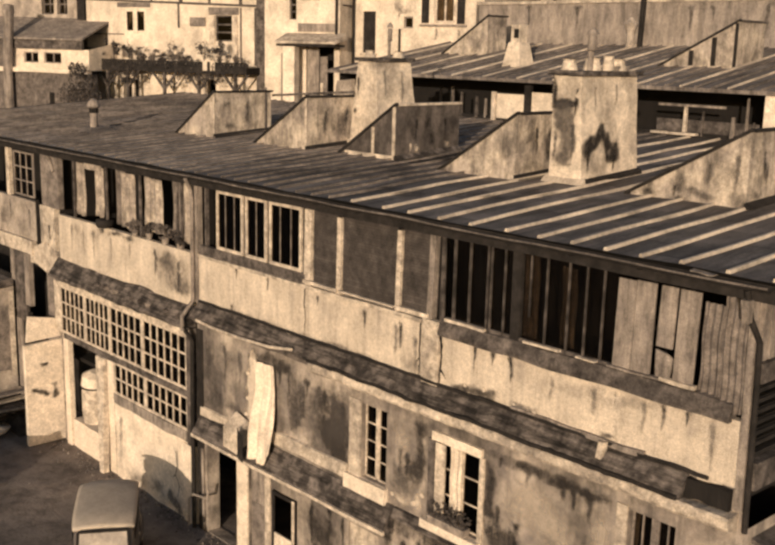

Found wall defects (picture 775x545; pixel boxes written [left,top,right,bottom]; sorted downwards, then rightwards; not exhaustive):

water stain [154,250,188,293]
crack [415,323,445,383]
water stain [261,352,348,462]
water stain [397,423,425,485]
water stain [483,463,518,545]
water stain [511,462,609,545]